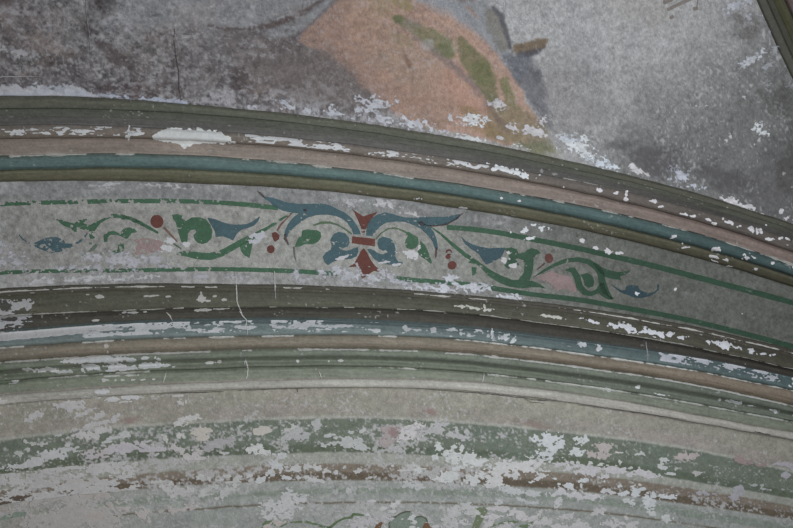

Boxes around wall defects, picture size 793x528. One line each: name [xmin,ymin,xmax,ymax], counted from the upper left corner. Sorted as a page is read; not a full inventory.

peeling [0,82,188,104]
peeling [273,93,507,142]
spalling [1,125,236,149]
peeling [368,150,438,164]
peeling [486,162,541,179]
peeling [505,115,650,177]
peeling [720,193,764,214]
peeling [680,213,790,246]
spalling [701,234,793,271]
peeling [412,309,793,392]
peeling [0,275,700,528]
spalling [445,352,793,422]